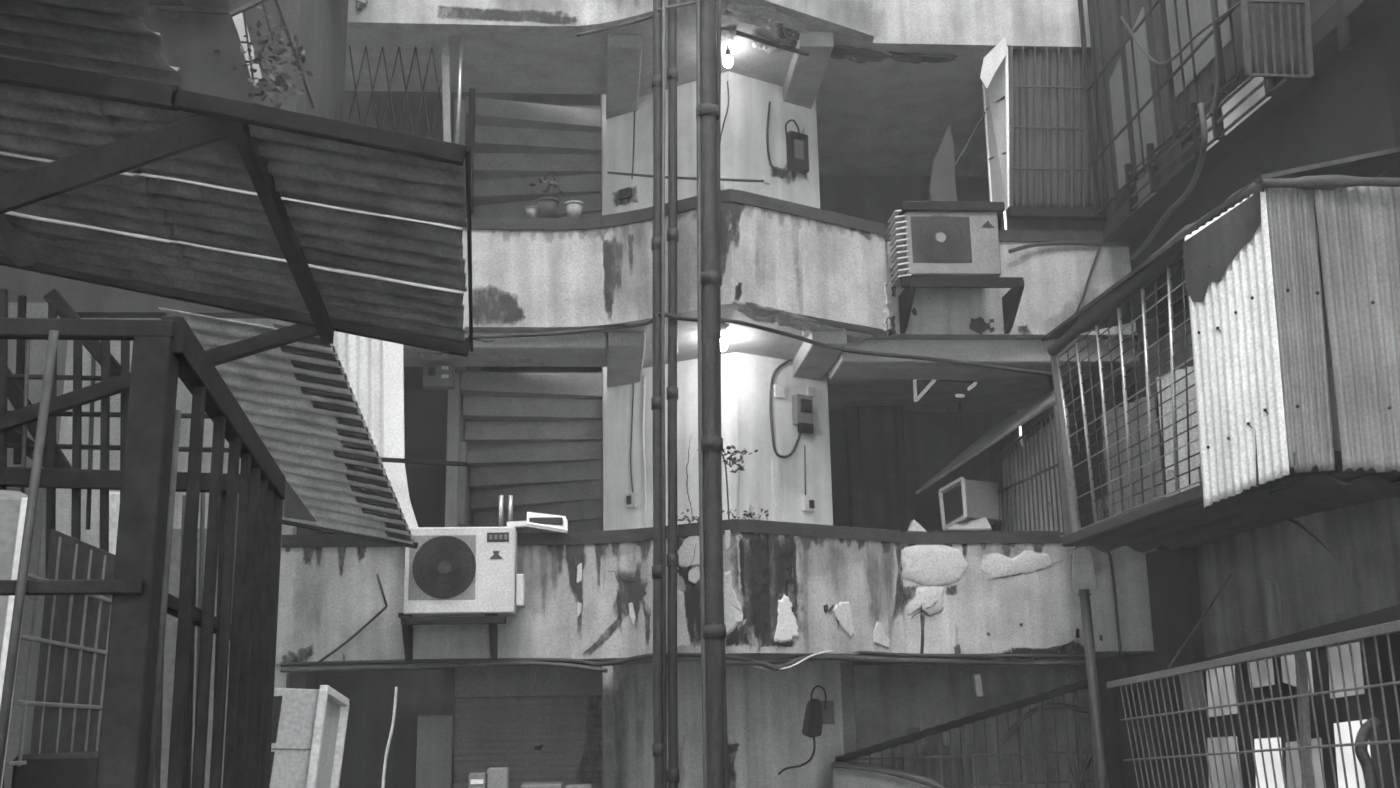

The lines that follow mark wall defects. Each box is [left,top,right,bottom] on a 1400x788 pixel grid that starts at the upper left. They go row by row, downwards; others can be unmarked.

damp [285,547,366,576]
damp [945,543,1015,556]
damp [547,537,701,654]
peeling [774,595,799,643]
damp [726,532,917,652]